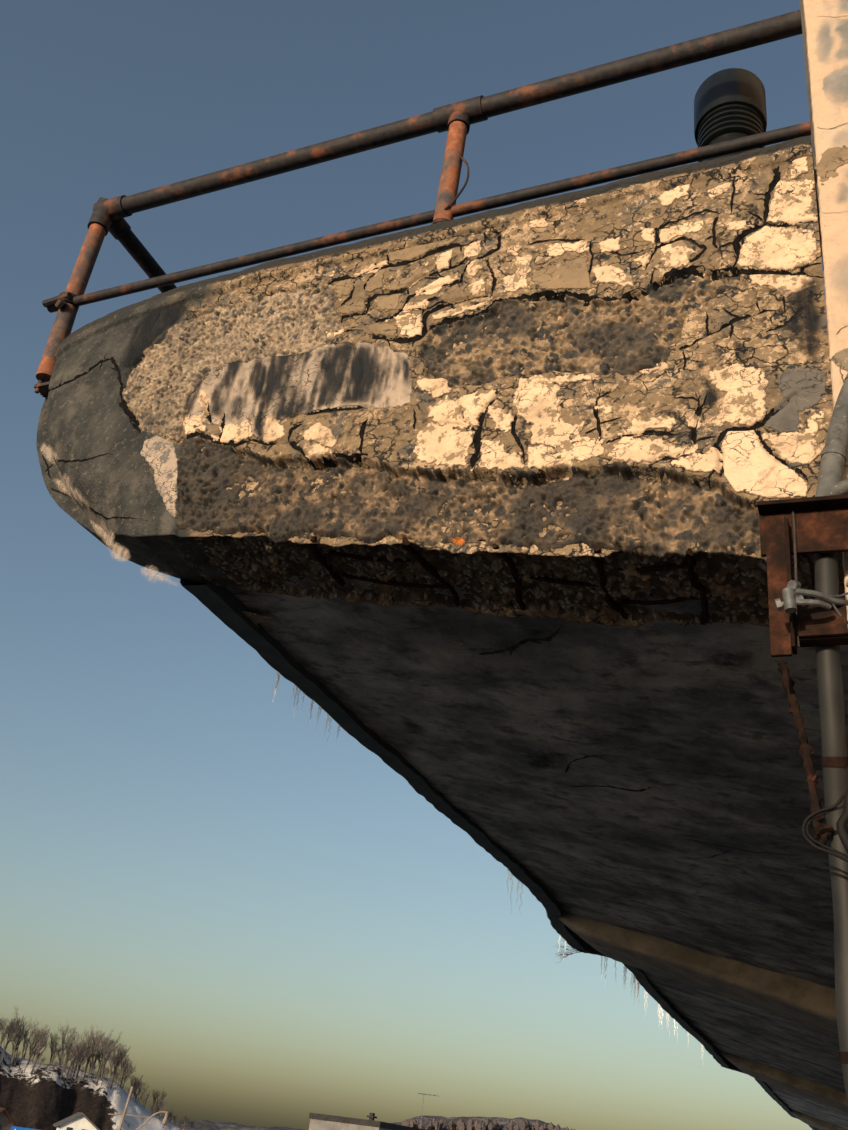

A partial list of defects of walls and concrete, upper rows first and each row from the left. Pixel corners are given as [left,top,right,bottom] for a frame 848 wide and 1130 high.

crack [328,166,844,488]
crack [40,355,141,433]
spalling [122,145,848,627]
crack [186,402,368,471]
crack [42,453,148,521]